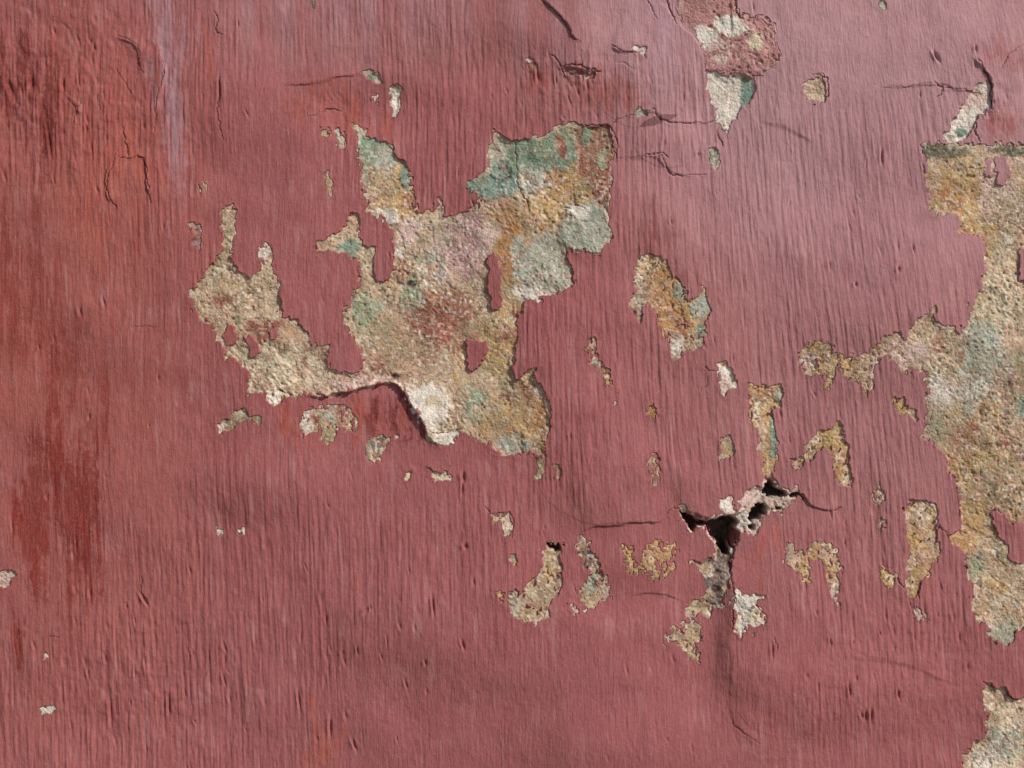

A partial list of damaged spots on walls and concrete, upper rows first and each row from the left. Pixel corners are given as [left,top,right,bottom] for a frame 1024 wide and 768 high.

crack [541,0,600,77]
flaking render [676,0,782,134]
crack [885,44,1024,140]
crack [106,128,151,205]
peeling [188,121,615,482]
peeling [628,254,711,361]
peeling [797,80,1024,647]
peeling [496,535,612,627]
peeling [620,539,680,582]
crack [729,534,778,645]
flaking render [663,360,853,665]
peeling [962,682,1024,768]